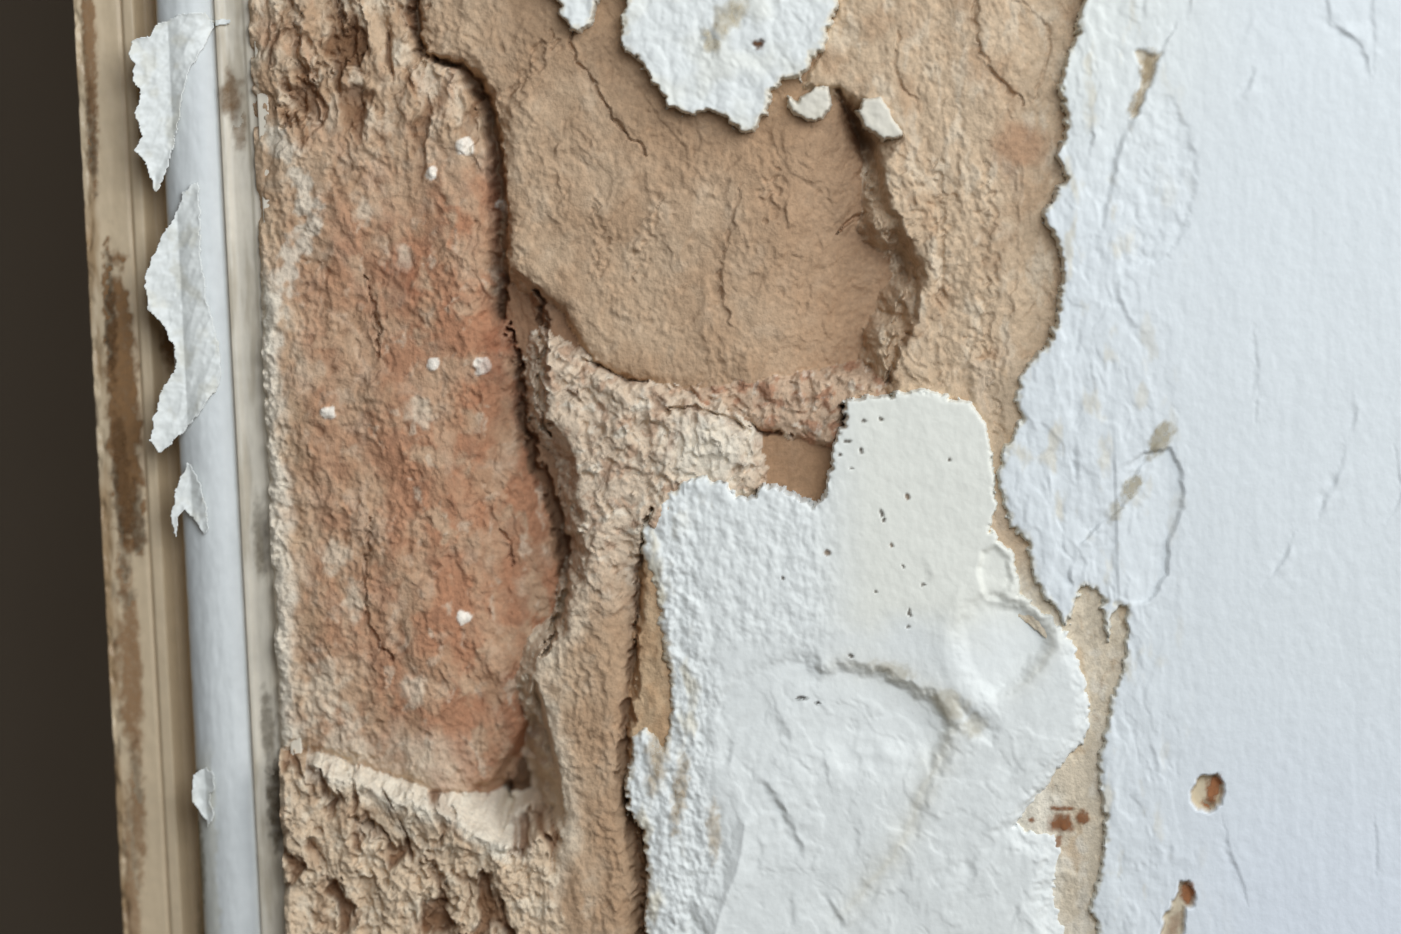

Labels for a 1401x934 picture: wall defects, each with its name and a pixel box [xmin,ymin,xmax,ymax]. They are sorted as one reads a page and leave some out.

peeling [81,0,98,186]
peeling [128,13,231,192]
crack [426,51,512,328]
crack [568,31,647,159]
crack [828,78,925,390]
peeling [101,182,222,748]
crack [586,360,795,439]
flaking render [248,0,1189,934]
peeling [192,767,215,827]
crack [610,507,655,934]
corrosion [1204,776,1222,807]
flaking render [1159,879,1200,934]